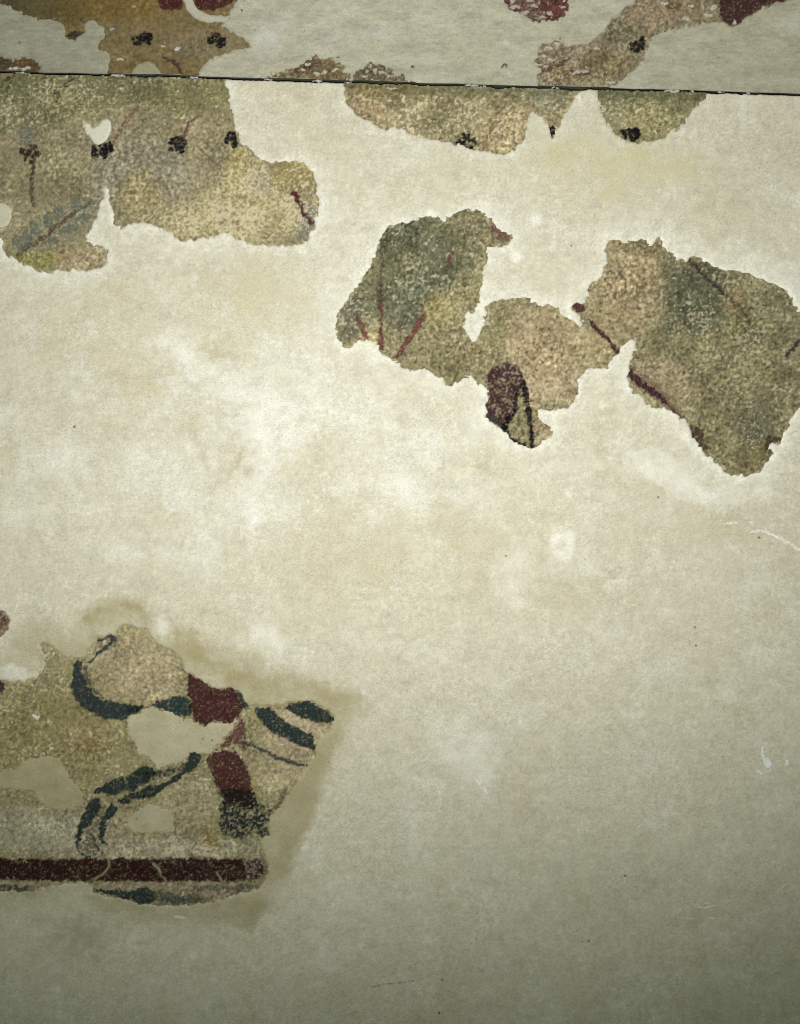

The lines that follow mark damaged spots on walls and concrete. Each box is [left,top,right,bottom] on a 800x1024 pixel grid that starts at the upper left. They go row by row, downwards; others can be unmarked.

water stain [0,239,537,975]